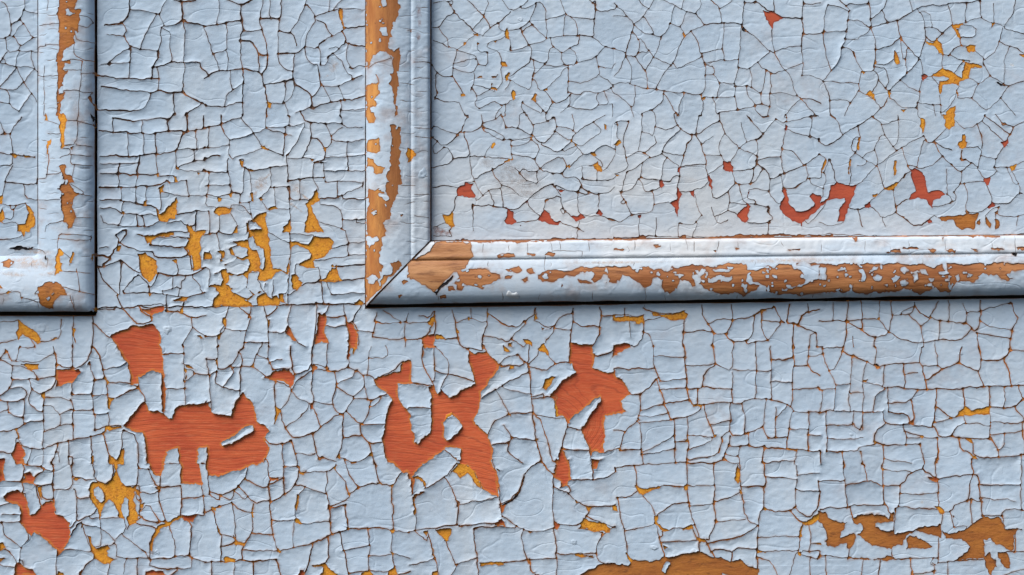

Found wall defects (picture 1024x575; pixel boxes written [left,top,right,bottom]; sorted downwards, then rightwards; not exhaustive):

peeling [11,0,81,158]
peeling [352,0,1024,305]
crack [399,0,1024,270]
peeling [0,428,115,564]
peeling [72,448,144,526]
peeling [102,176,343,491]
crack [0,0,631,575]
peeling [367,312,556,515]
peeling [542,342,632,469]
peeling [570,514,759,575]
crack [571,292,1024,575]
peeling [796,506,1022,575]